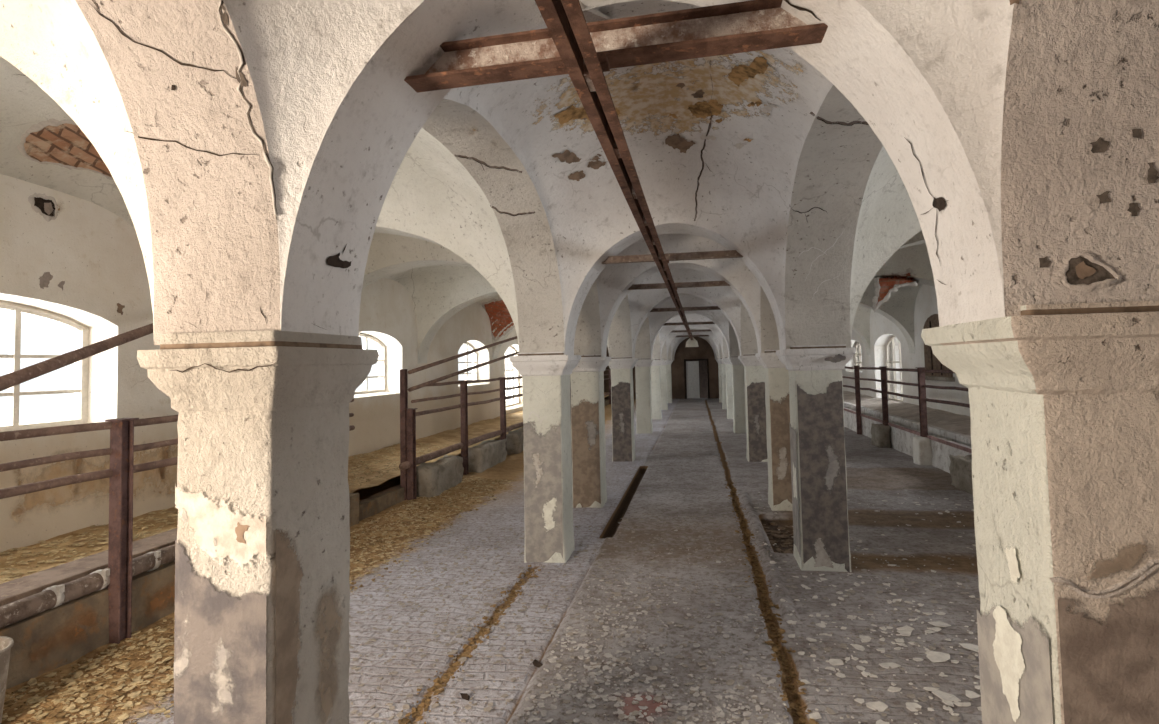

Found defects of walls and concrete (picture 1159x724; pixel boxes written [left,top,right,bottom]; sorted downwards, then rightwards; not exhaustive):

crack [92,0,236,79]
flaking render [16,118,114,180]
crack [126,131,256,156]
water stain [552,150,606,181]
water stain [605,50,803,153]
crack [904,137,948,285]
spalling [1039,249,1124,293]
crack [126,362,276,382]
water stain [747,382,801,558]
peeling [175,486,266,572]
water stain [174,529,304,724]
peeling [976,543,1159,724]